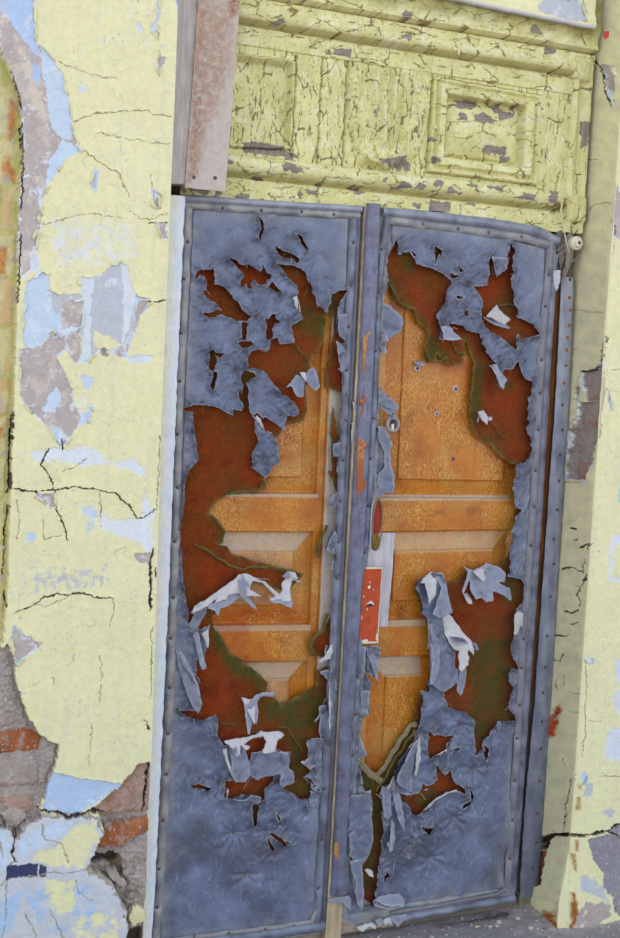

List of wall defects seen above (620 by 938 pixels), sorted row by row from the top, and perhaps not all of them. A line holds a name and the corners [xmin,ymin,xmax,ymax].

peeling [136,0,167,77]
crack [11,71,25,209]
crack [14,234,22,303]
peeling [0,0,154,476]
crack [42,109,172,240]
spalling [564,360,615,483]
crack [2,411,161,627]
peeling [75,489,155,564]
crack [148,548,157,696]
crack [539,527,620,885]
spalling [0,625,150,938]
spalling [559,823,620,938]